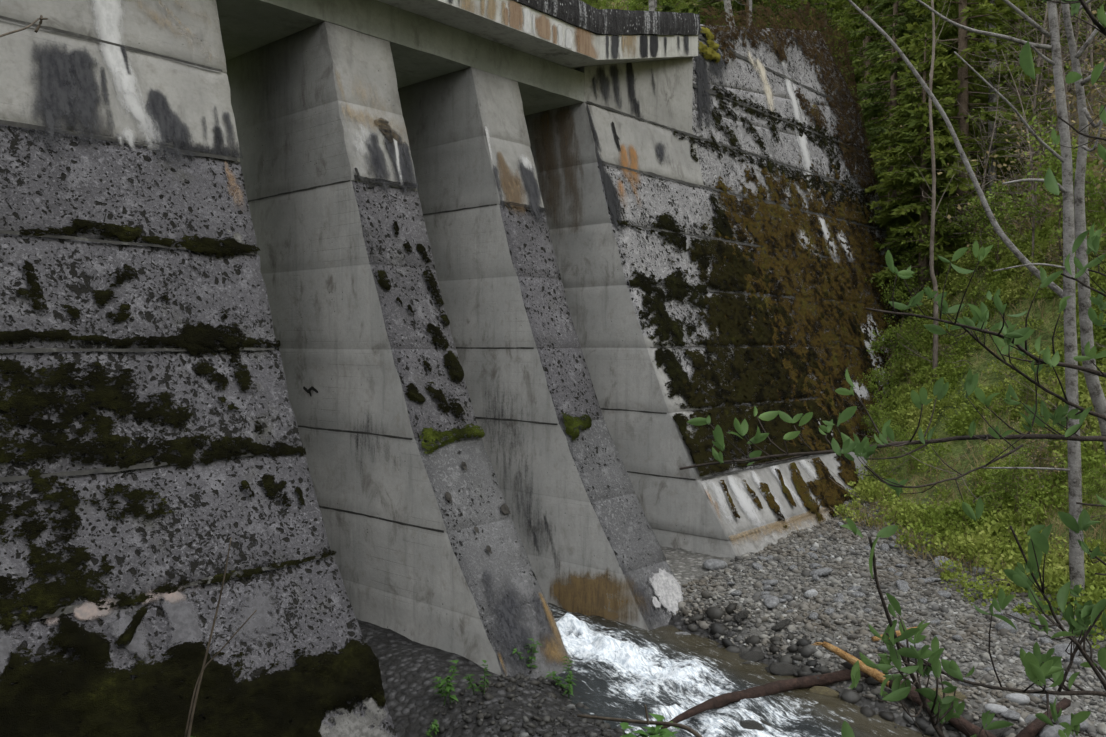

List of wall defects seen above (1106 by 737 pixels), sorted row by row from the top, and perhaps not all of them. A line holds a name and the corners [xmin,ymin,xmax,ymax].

water stain [28,0,243,162]
corrosion [461,0,557,44]
corrosion [575,27,597,59]
corrosion [619,145,639,196]
water stain [587,35,727,231]
water stain [483,565,664,676]